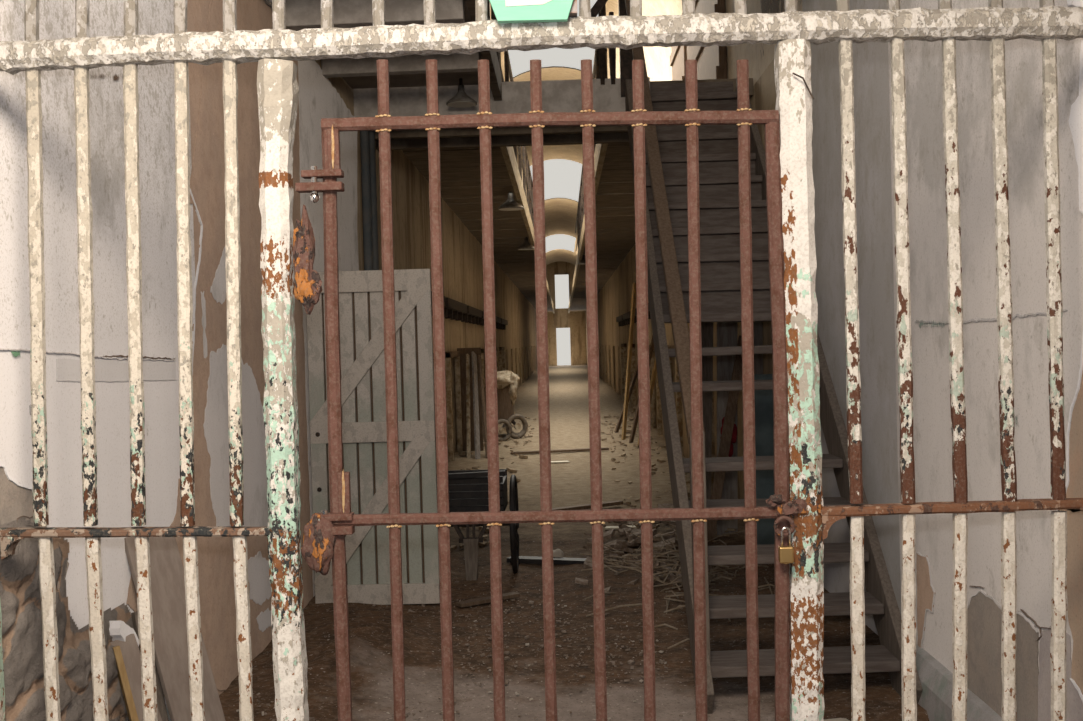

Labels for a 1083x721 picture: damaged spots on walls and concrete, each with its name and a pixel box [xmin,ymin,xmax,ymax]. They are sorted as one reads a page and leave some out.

flaking render [206,0,223,32]
flaking render [236,0,273,31]
flaking render [170,63,238,691]
flaking render [237,62,272,660]
flaking render [294,298,315,608]
flaking render [0,464,47,721]
flaking render [53,538,94,721]
flaking render [104,575,139,721]